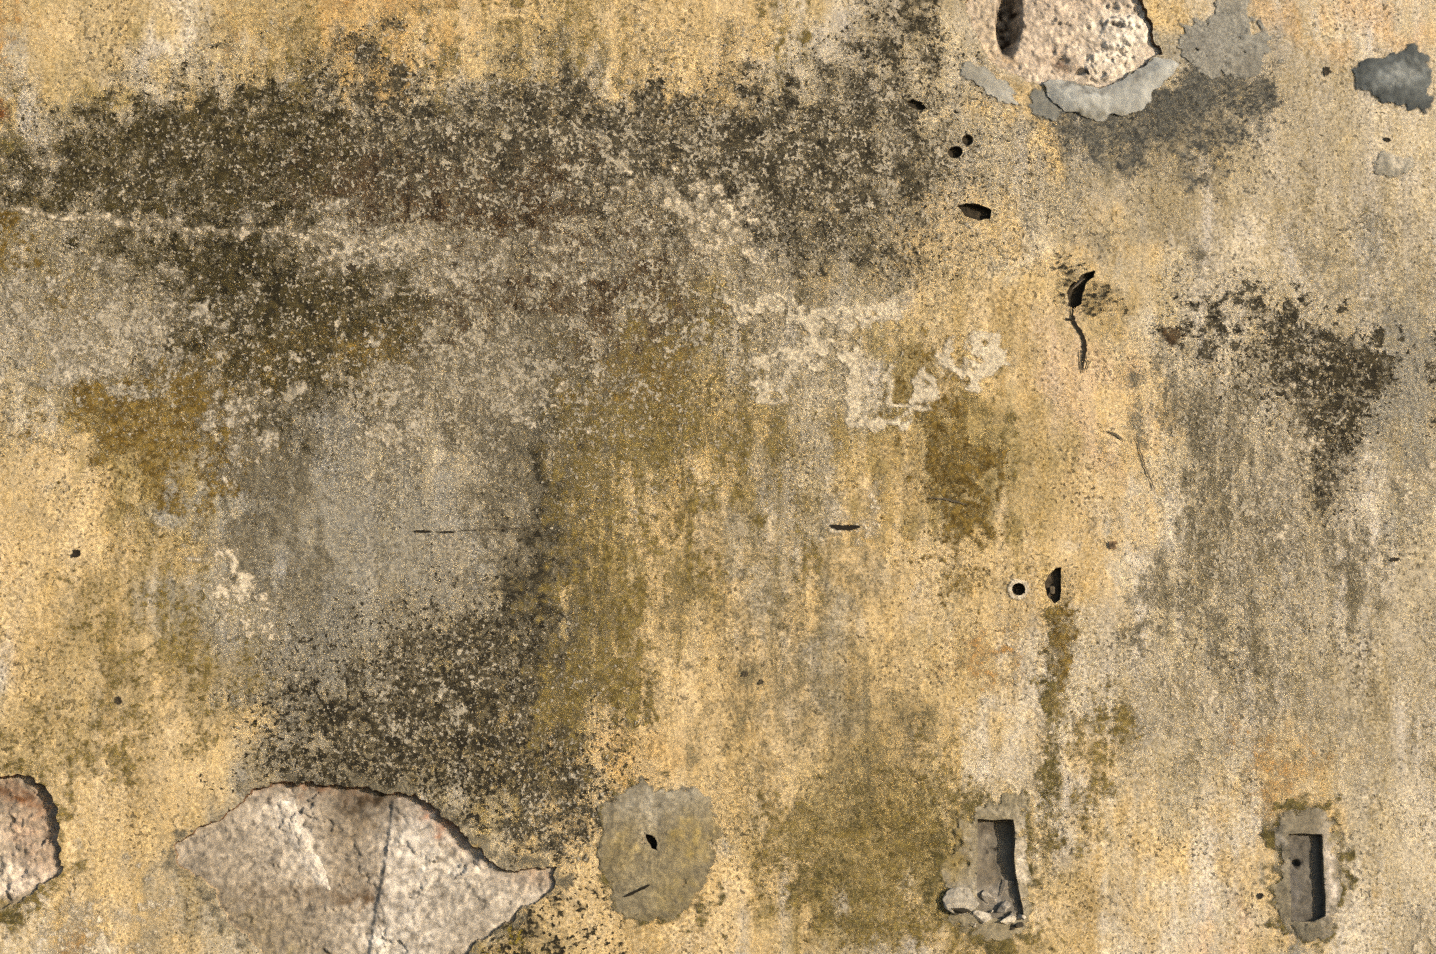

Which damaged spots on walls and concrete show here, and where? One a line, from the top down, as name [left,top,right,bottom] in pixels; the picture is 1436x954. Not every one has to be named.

spalling [965,0,1163,88]
crack [1065,308,1089,373]
water stain [789,514,823,586]
water stain [818,481,881,545]
water stain [921,330,1021,614]
water stain [1098,242,1436,764]
water stain [998,594,1064,790]
spalling [0,774,64,910]
water stain [28,853,176,954]
spalling [173,781,557,954]